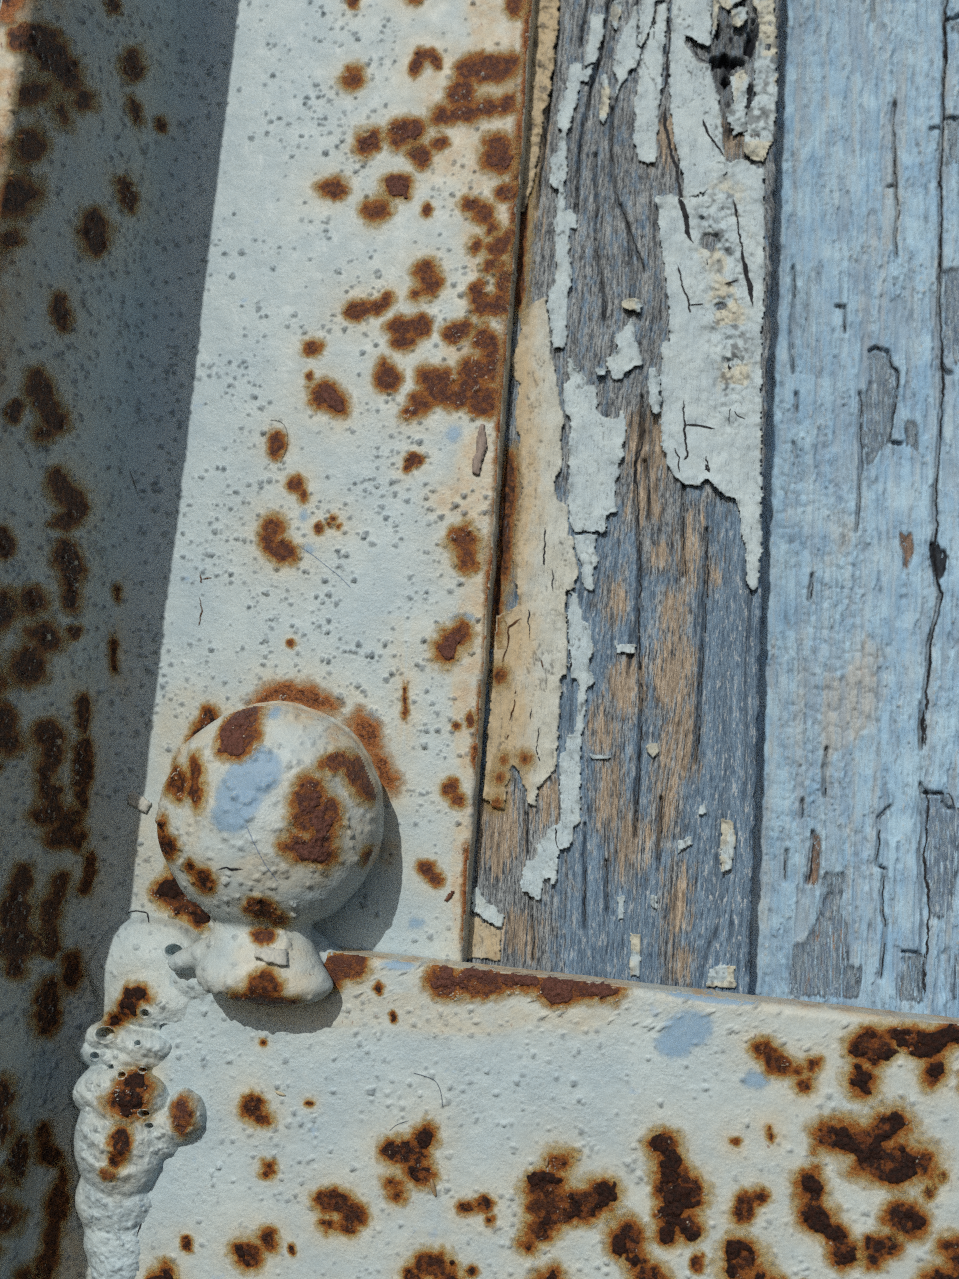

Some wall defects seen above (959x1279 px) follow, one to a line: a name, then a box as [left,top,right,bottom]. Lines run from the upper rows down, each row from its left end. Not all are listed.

corrosion [313,0,534,772]
peeling [482,0,779,900]
crack [857,347,903,531]
crack [920,0,959,748]
corrosion [148,680,403,932]
peeling [467,887,505,961]
peeling [617,896,625,920]
peeling [629,933,642,976]
crack [876,813,886,978]
crack [920,786,959,995]
corrosion [513,1124,788,1279]
corrosion [790,1021,959,1279]